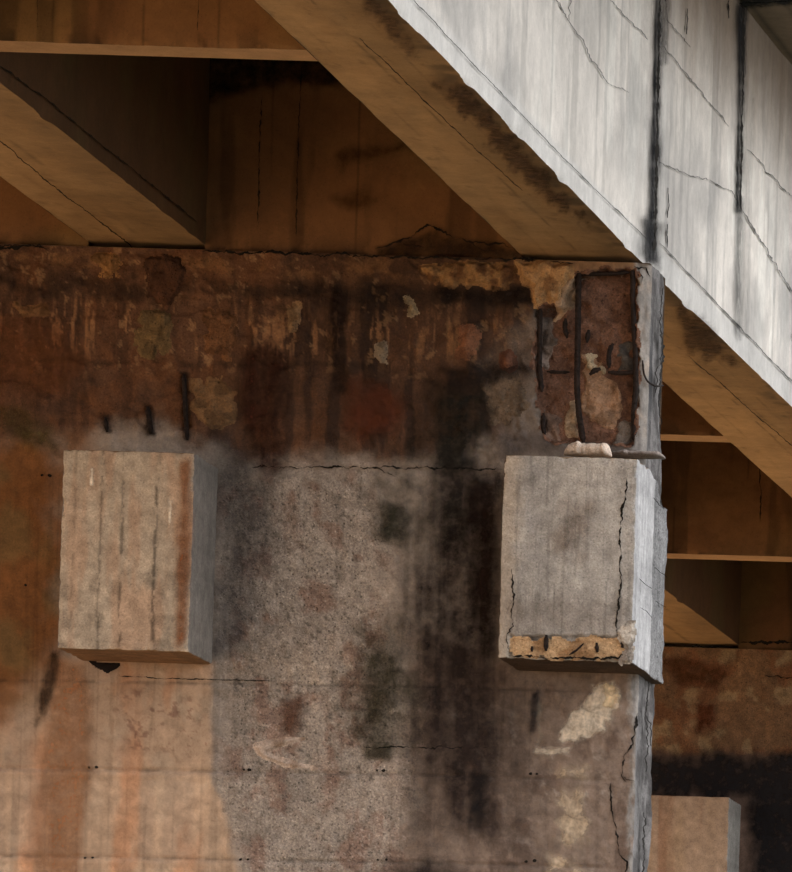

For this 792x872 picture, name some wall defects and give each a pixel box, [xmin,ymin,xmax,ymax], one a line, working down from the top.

crack [0,141,133,248]
crack [414,0,792,381]
leakage [644,0,670,267]
leakage [736,0,792,332]
spalling [418,259,664,448]
crack [634,266,665,434]
crack [252,465,502,475]
leakage [413,363,530,827]
crack [500,569,622,661]
spalling [509,620,637,666]
crack [615,479,665,631]
crack [609,682,652,872]